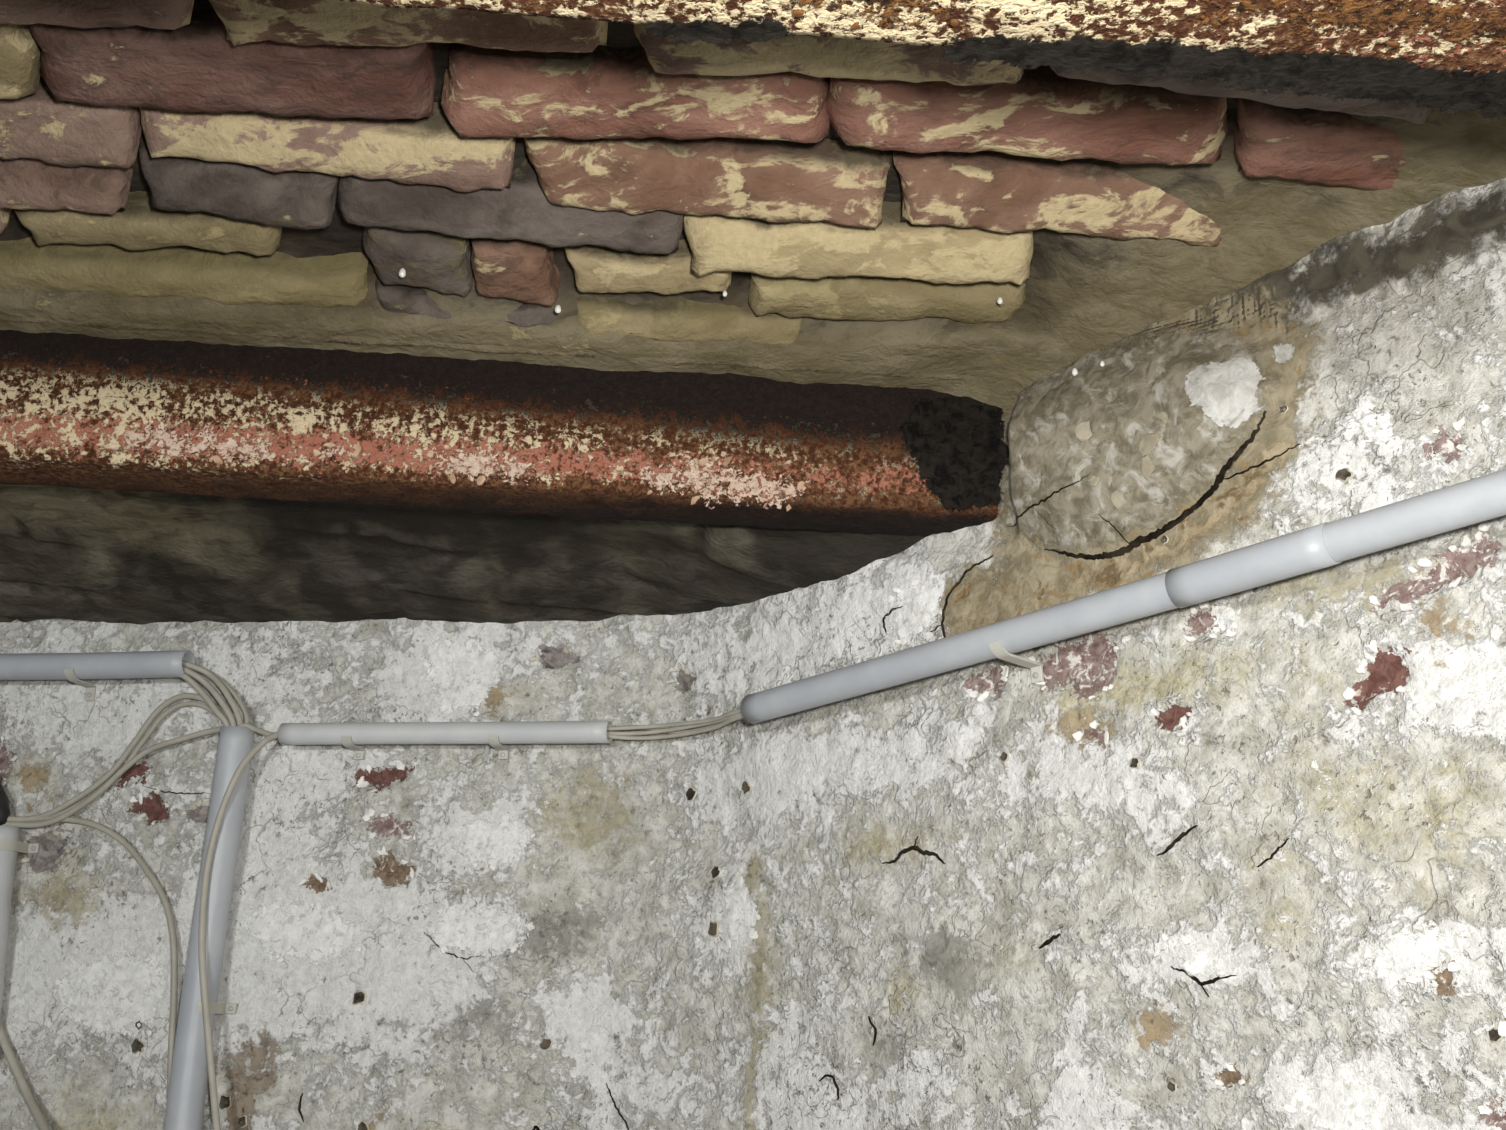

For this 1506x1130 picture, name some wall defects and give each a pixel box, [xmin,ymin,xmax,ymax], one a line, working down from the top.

rust [779,0,971,30]
peeling [111,420,275,467]
peeling [426,445,545,486]
peeling [637,456,811,512]
spalling [1335,468,1354,482]
peeling [1343,401,1395,453]
spalling [1422,417,1466,464]
crack [930,411,1300,638]
spalling [1369,523,1501,616]
crack [882,606,903,633]
peeling [885,578,945,645]
spalling [1183,601,1241,642]